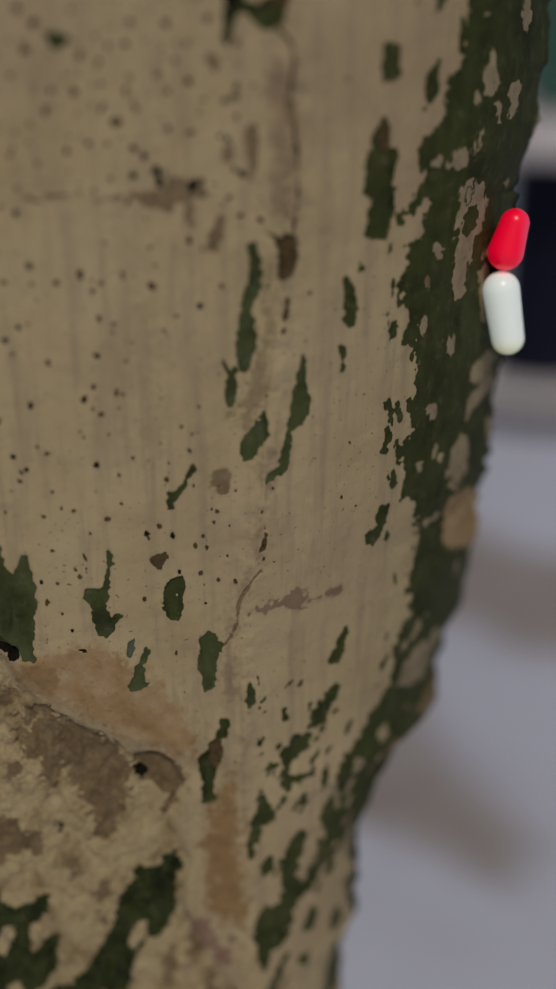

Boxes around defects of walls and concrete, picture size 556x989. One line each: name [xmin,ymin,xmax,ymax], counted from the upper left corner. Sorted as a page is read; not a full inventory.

peeling [28,18,69,49]
peeling [202,0,289,74]
spalling [219,122,261,184]
crack [277,26,300,232]
spalling [181,200,199,245]
spalling [205,214,225,252]
flaking render [222,233,300,461]
peeling [164,448,197,510]
spalling [207,467,237,497]
peeling [244,0,551,989]
crack [223,569,263,648]
flaking render [0,546,236,989]